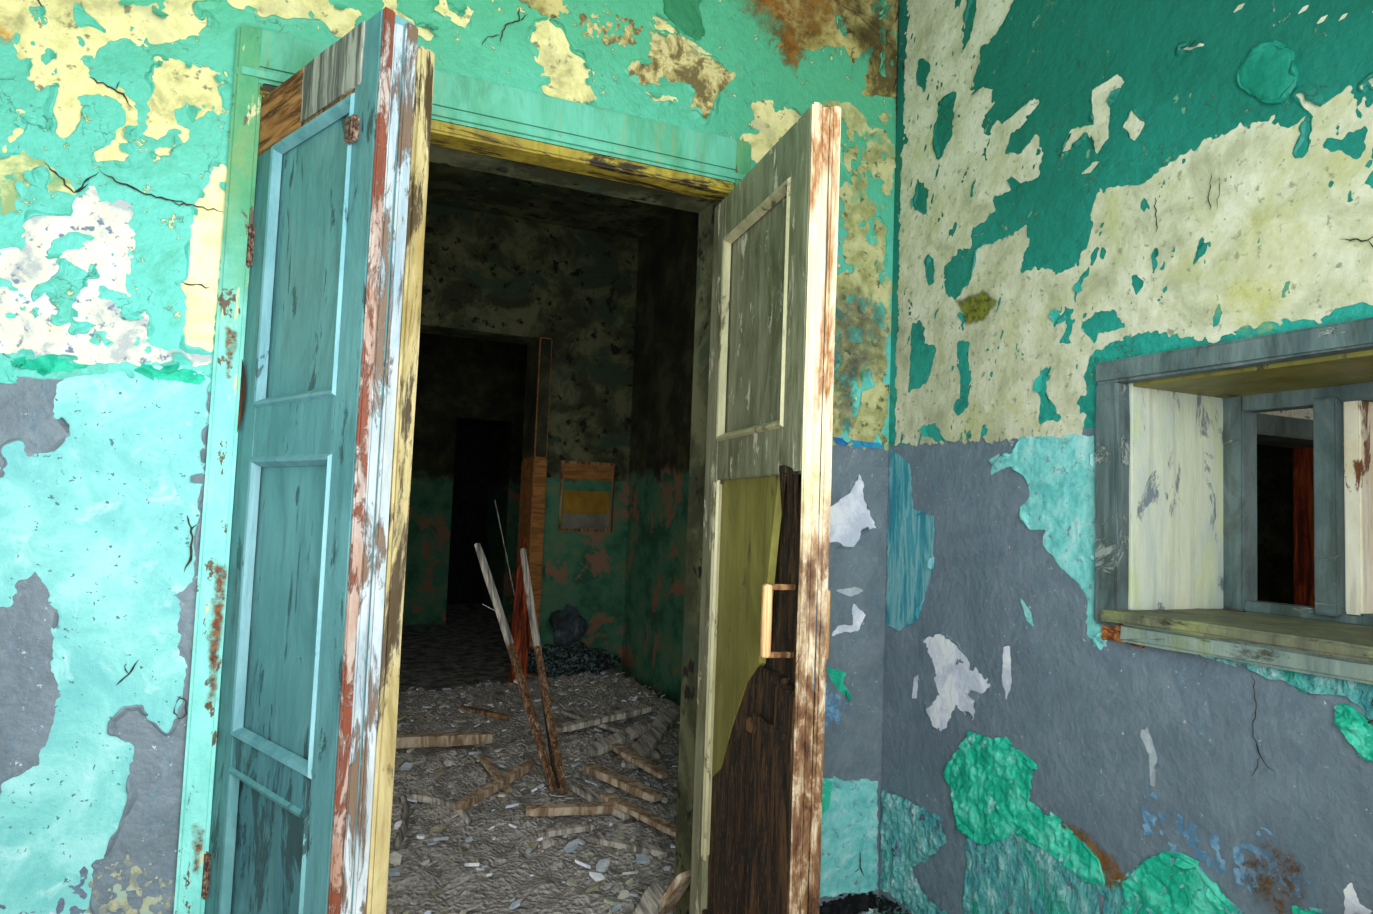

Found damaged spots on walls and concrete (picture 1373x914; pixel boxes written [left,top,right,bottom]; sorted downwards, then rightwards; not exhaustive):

peeling [382,0,474,41]
peeling [519,0,736,125]
rust [755,0,841,78]
peeling [740,99,804,163]
leakage [834,299,882,428]
peeling [765,0,1373,650]
peeling [0,0,365,914]
peeling [1194,654,1373,763]
peeling [820,690,1243,914]
peeling [1292,905,1325,914]